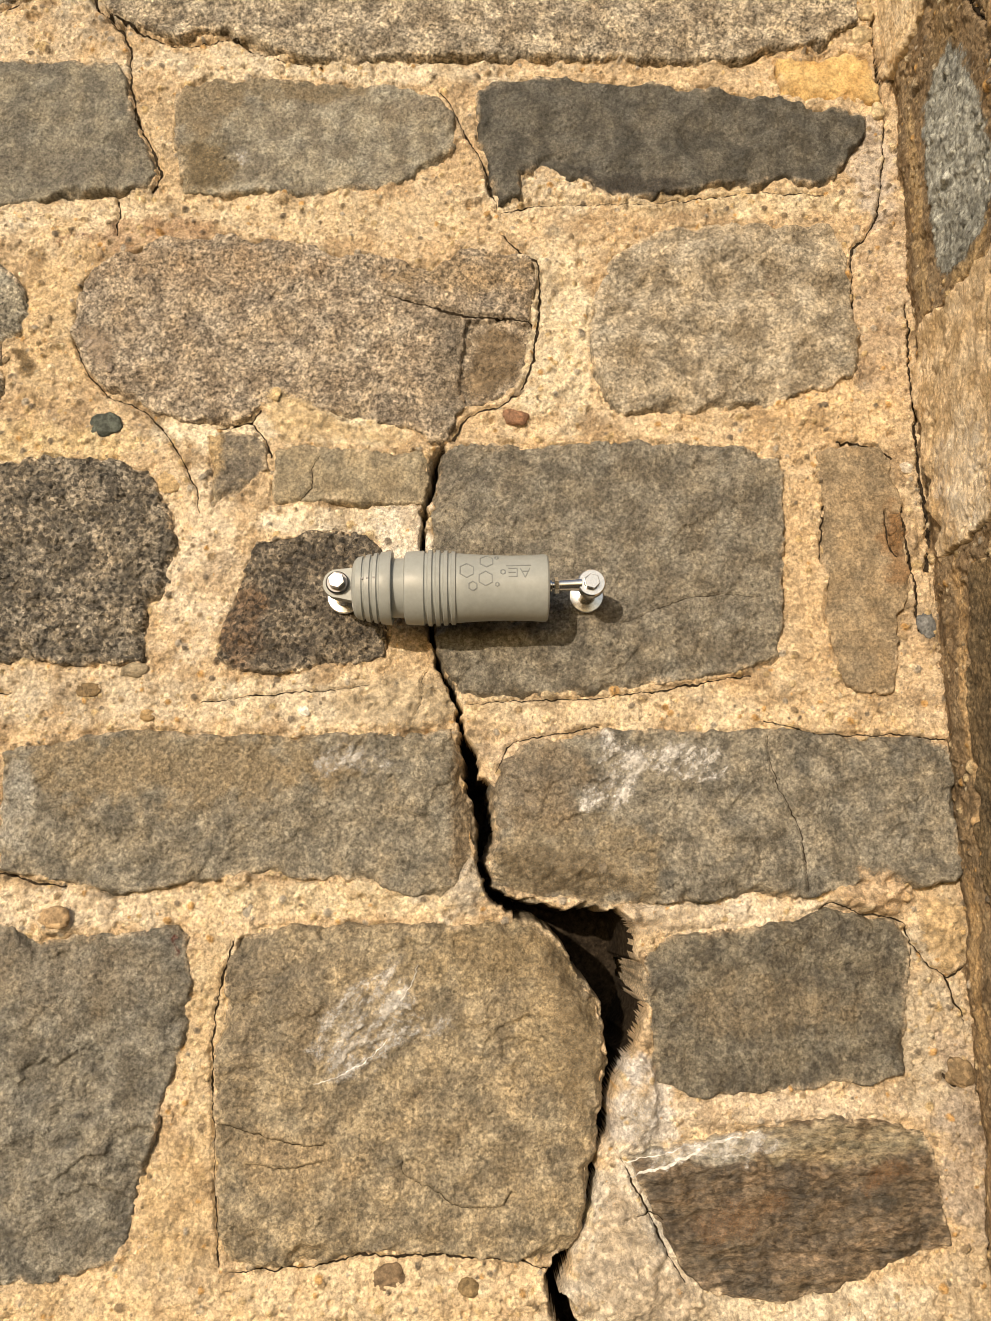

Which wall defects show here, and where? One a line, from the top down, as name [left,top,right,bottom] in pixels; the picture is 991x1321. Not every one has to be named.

crack [211,940,575,1321]
crack [415,626,751,1283]
crack [763,721,964,1021]